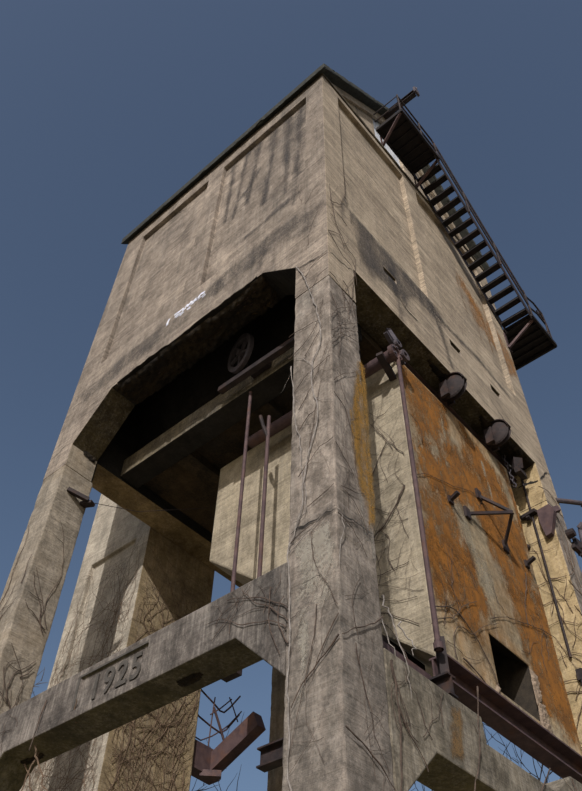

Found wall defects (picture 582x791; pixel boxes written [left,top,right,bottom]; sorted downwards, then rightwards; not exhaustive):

damp [225,141,262,218]
damp [270,109,304,174]
damp [106,330,169,378]
damp [352,214,505,392]
corrosion [350,363,375,525]
corrosion [401,365,578,742]